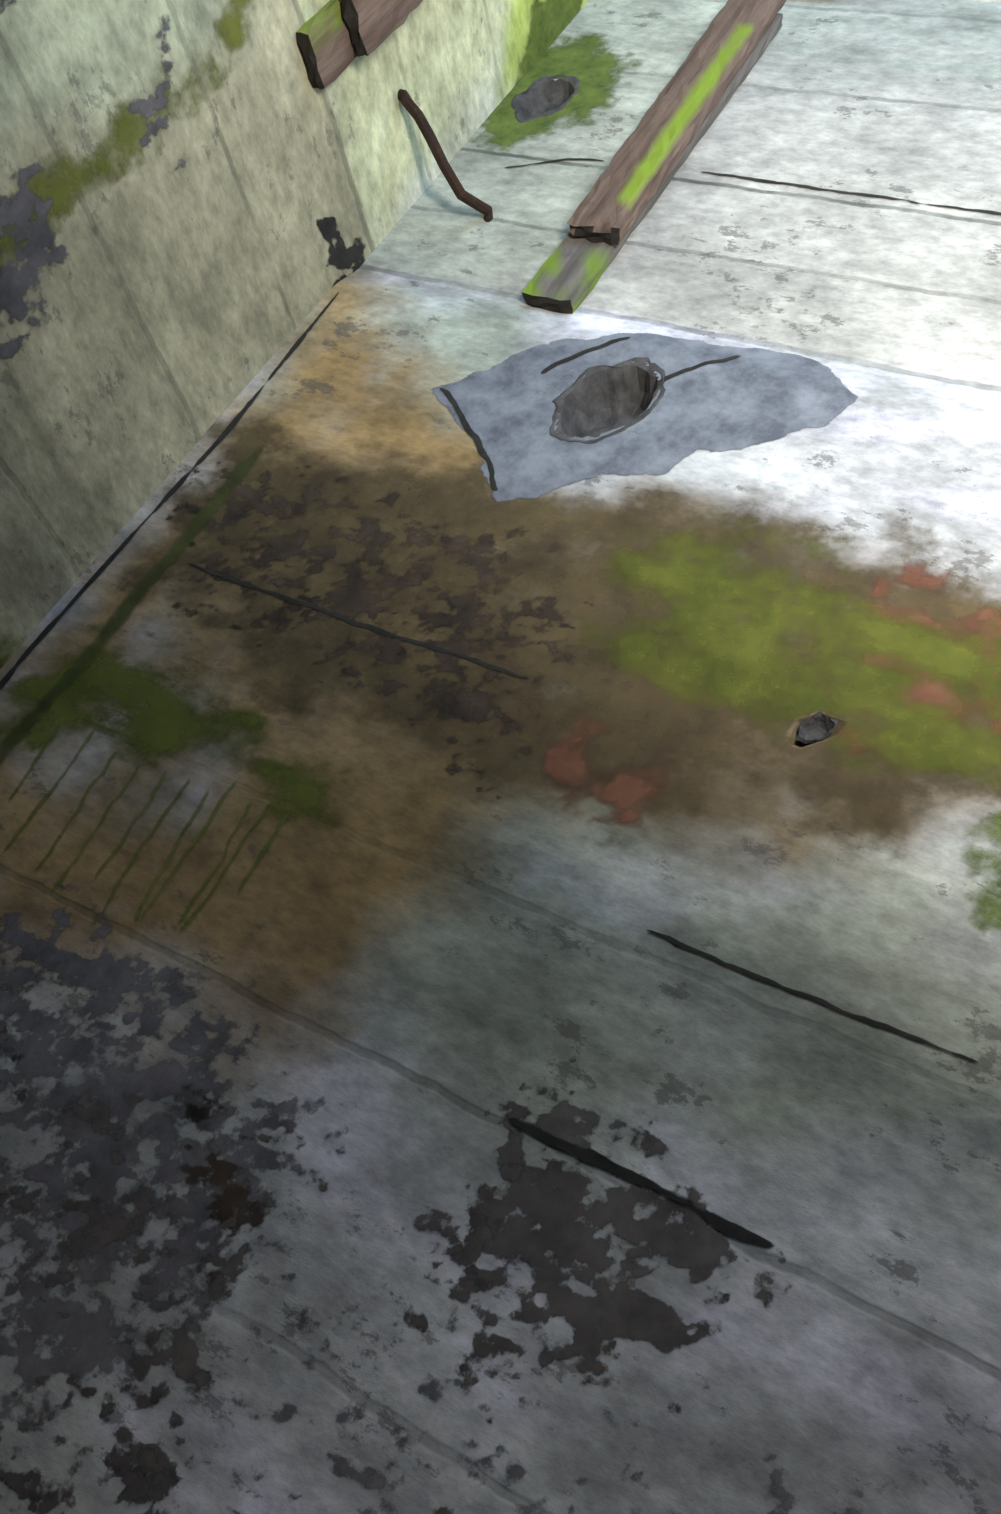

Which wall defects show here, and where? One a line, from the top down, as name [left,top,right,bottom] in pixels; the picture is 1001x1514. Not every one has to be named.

peeling [433,333,858,502]
leakage [119,419,1001,836]
leakage [5,729,93,851]
leakage [37,751,117,870]
leakage [94,775,189,923]
leakage [136,785,234,920]
leakage [180,804,286,932]
peeling [0,885,328,1514]
peeling [394,1311,428,1332]
peeling [414,1083,737,1401]
peeling [755,1251,791,1307]
peeling [327,1428,408,1514]